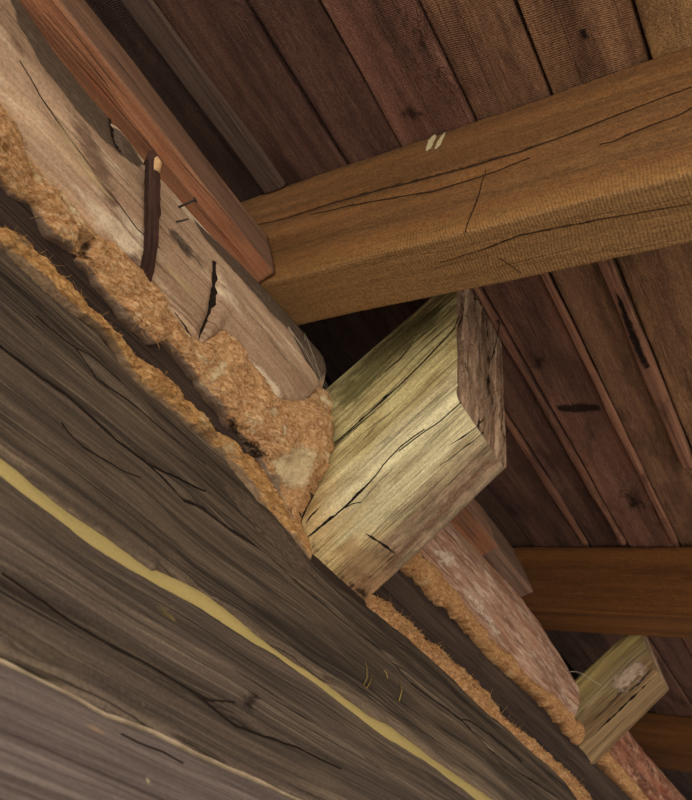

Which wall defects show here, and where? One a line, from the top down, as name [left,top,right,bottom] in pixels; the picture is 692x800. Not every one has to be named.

crack [258,87,692,233]
crack [442,203,692,273]
crack [334,317,460,447]
crack [0,344,557,797]
leakage [614,663,644,692]